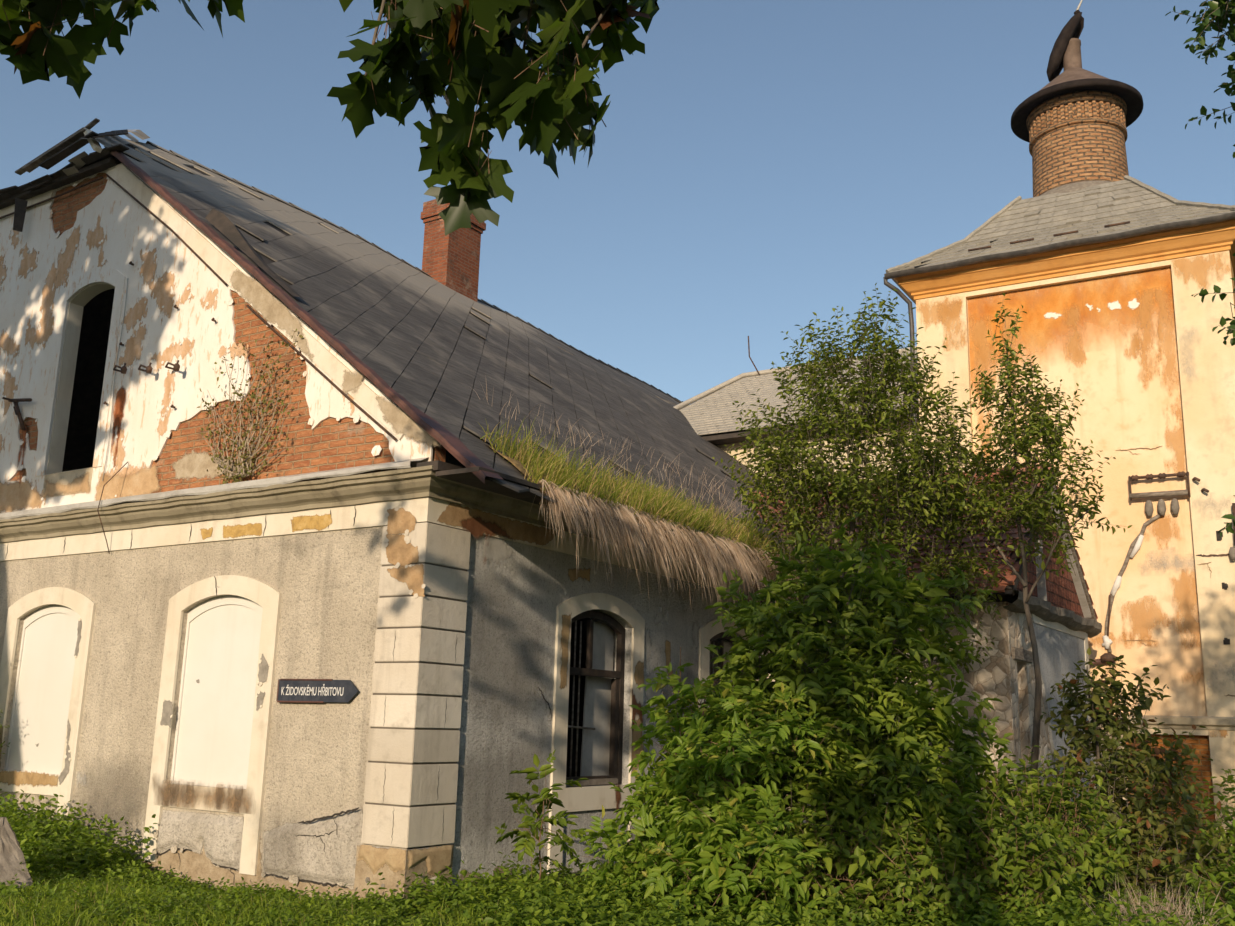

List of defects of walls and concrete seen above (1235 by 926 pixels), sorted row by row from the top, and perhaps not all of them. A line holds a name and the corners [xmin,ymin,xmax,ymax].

flaking render [0,173,109,417]
damp [920,253,1230,399]
flaking render [99,248,397,501]
flaking render [0,416,38,451]
corrosion [111,388,125,466]
damp [979,417,990,457]
flaking render [11,465,46,508]
peeling [201,523,262,540]
peeling [291,514,332,532]
flaking render [384,506,426,598]
damp [158,782,250,813]
crack [157,769,394,890]